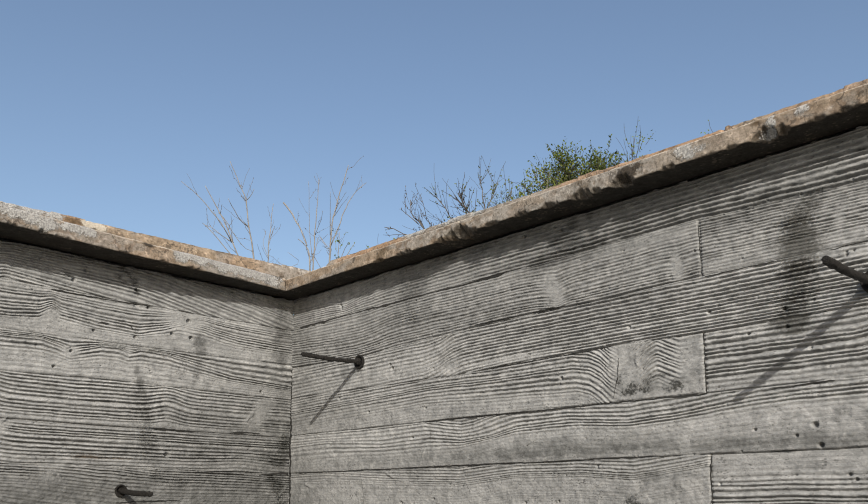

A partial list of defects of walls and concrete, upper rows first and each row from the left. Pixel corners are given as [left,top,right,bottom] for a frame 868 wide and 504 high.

leakage [774,195,822,336]